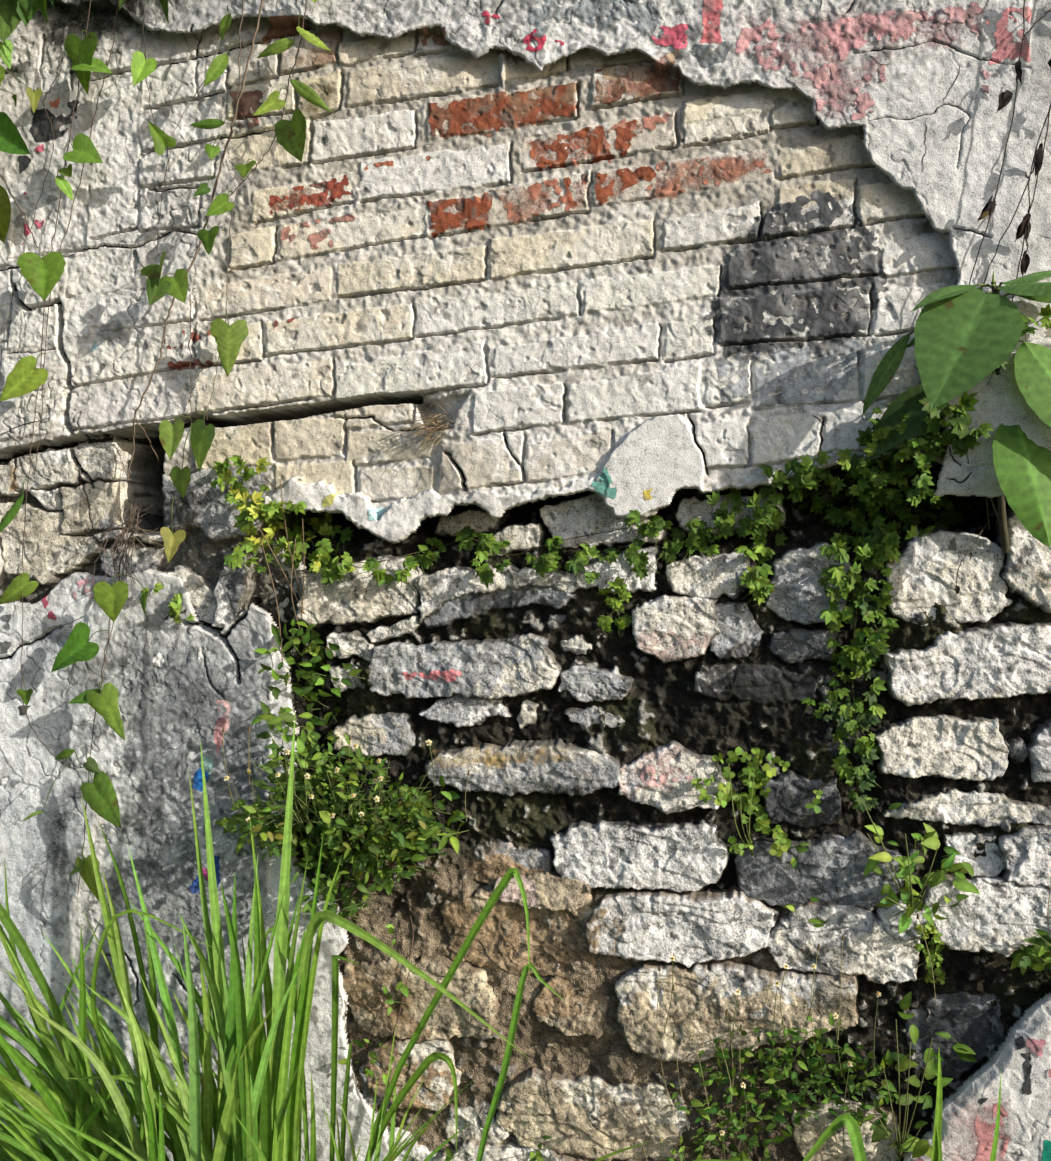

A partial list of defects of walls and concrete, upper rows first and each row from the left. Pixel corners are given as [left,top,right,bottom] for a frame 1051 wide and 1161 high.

peeling [566,0,688,49]
peeling [692,0,985,121]
crack [862,40,1028,172]
crack [0,413,158,485]
crack [447,453,467,489]
crack [688,415,708,473]
spalling [0,542,114,620]
spalling [160,527,251,587]
crack [0,616,85,660]
crack [162,601,261,696]
spalling [338,931,438,1114]
peeling [1015,1036,1046,1095]